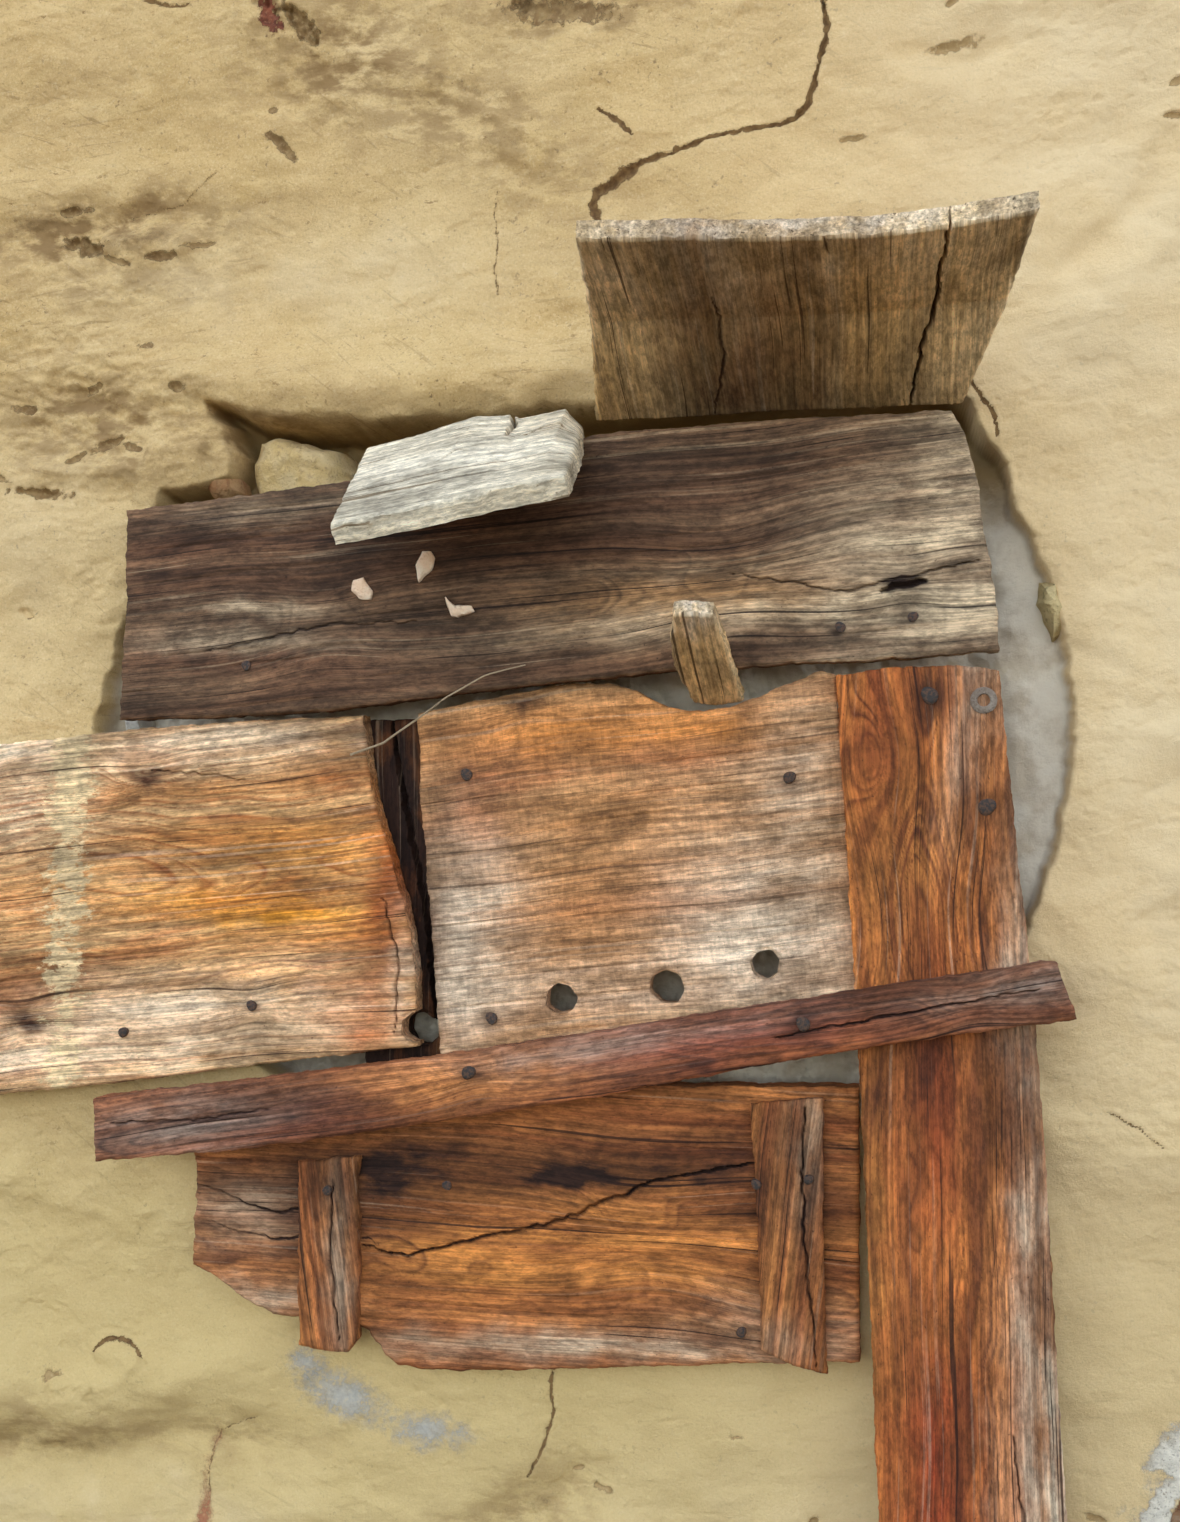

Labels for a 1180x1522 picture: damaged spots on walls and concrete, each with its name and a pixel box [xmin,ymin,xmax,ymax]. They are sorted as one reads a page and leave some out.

crack [588,0,831,220]
crack [527,1369,556,1477]
flaking render [1087,1513,1106,1522]
flaking render [1140,1424,1180,1522]